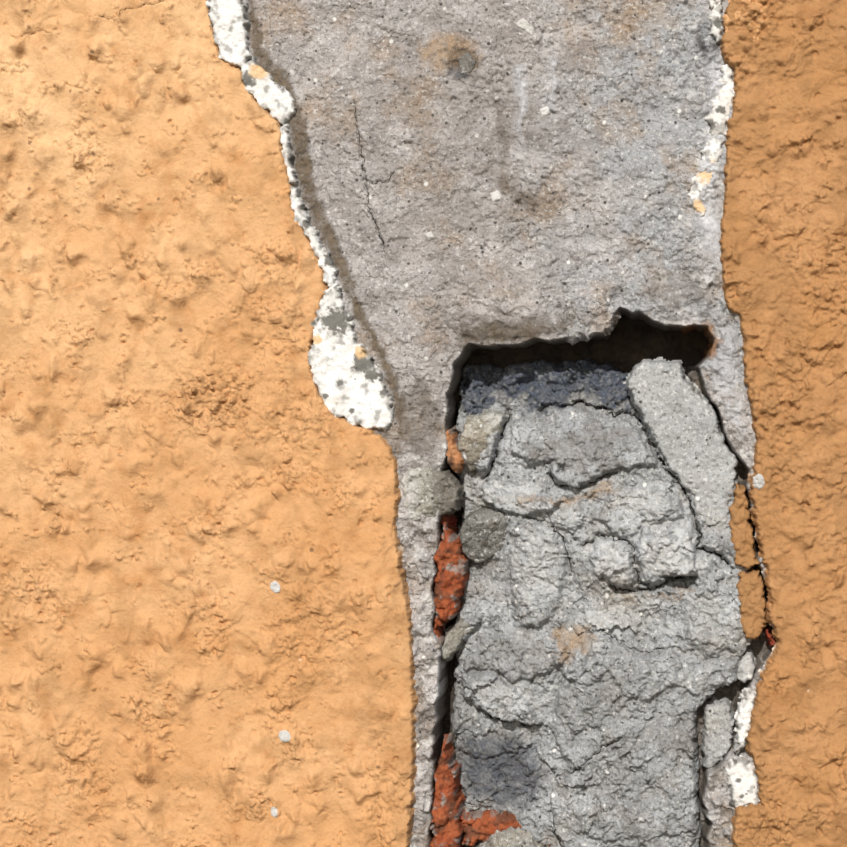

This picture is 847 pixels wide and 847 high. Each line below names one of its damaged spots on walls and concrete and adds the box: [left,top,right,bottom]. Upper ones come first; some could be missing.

crack [354,104,395,252]
spalling [206,0,774,847]